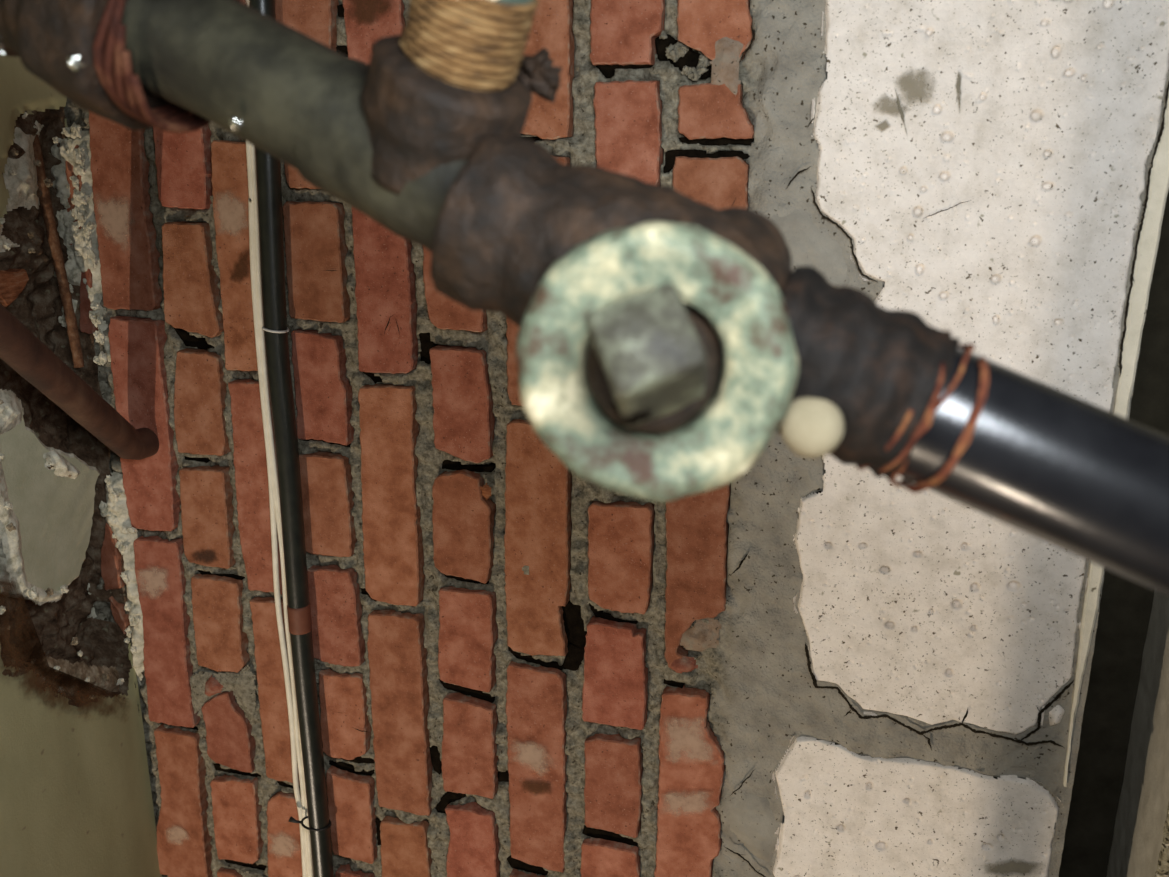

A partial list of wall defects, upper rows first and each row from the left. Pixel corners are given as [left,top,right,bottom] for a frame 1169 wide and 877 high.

spalling [655,30,712,81]
water stain [877,72,928,131]
spalling [0,107,111,398]
spalling [0,358,144,707]
spalling [562,600,587,671]
spalling [671,617,722,673]
spalling [190,665,256,718]
crack [805,643,1074,750]